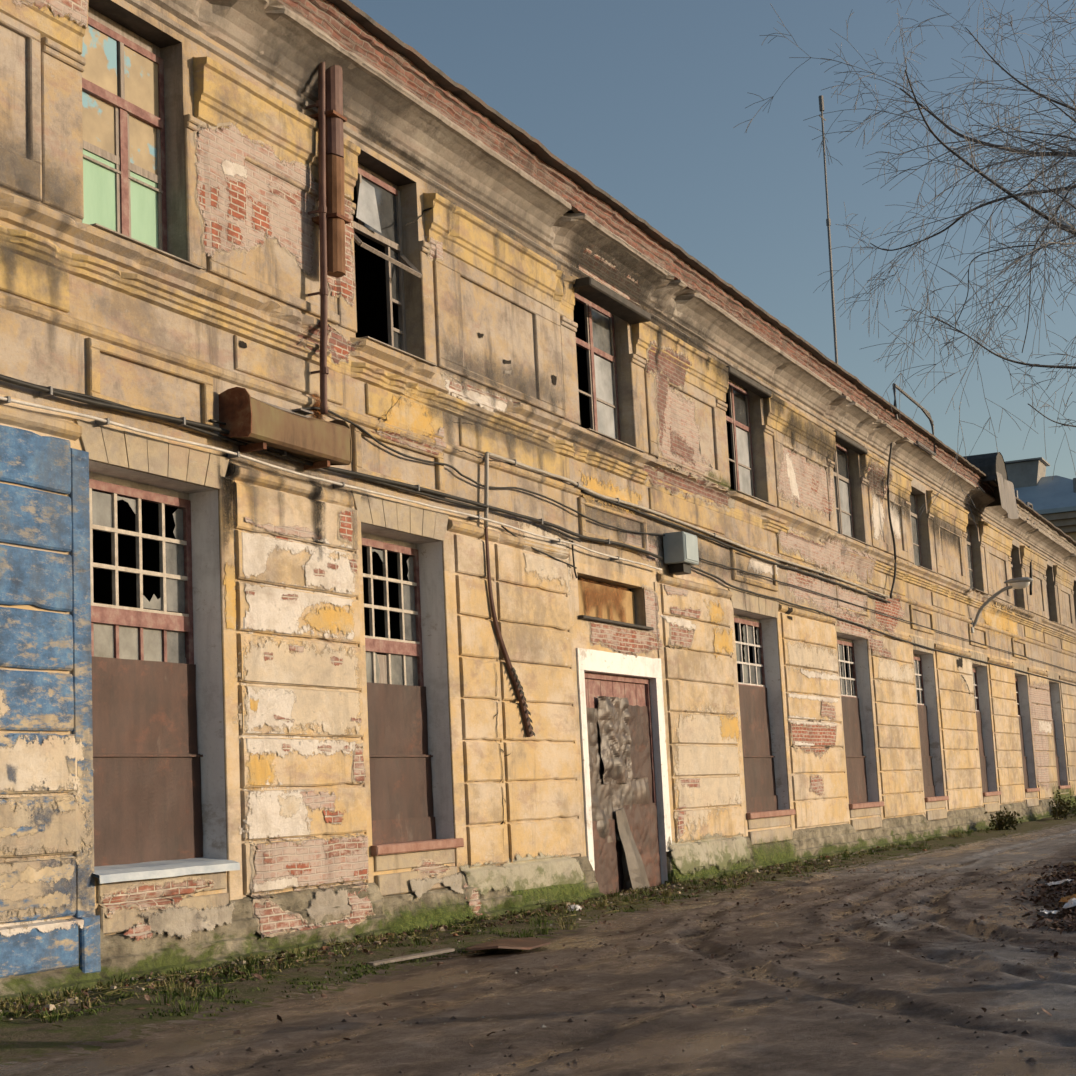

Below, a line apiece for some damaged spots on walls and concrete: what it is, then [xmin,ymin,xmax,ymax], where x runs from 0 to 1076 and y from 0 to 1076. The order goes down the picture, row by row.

flaking render [13,0,88,27]
flaking render [193,121,319,276]
flaking render [327,189,356,308]
flaking render [640,340,735,513]
flaking render [776,442,834,518]
peeling [0,726,215,941]
rust [92,656,203,867]
peeling [233,508,366,786]
flaking render [239,780,376,939]
flaking render [588,583,701,658]
flaking render [786,692,838,760]
flaking render [748,461,915,686]